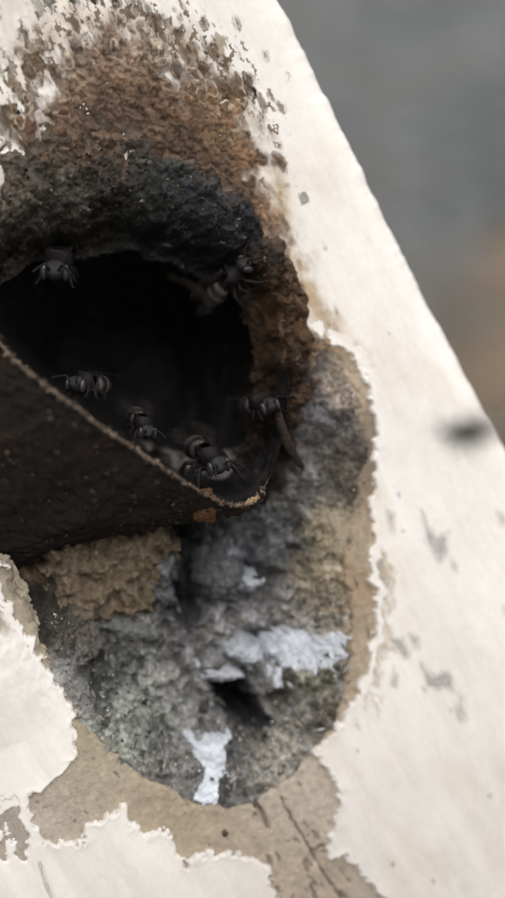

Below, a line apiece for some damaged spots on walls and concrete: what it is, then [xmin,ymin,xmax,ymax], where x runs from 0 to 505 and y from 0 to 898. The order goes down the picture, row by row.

damp [0,0,290,259]
damp [299,317,331,363]
spalling [0,334,381,898]